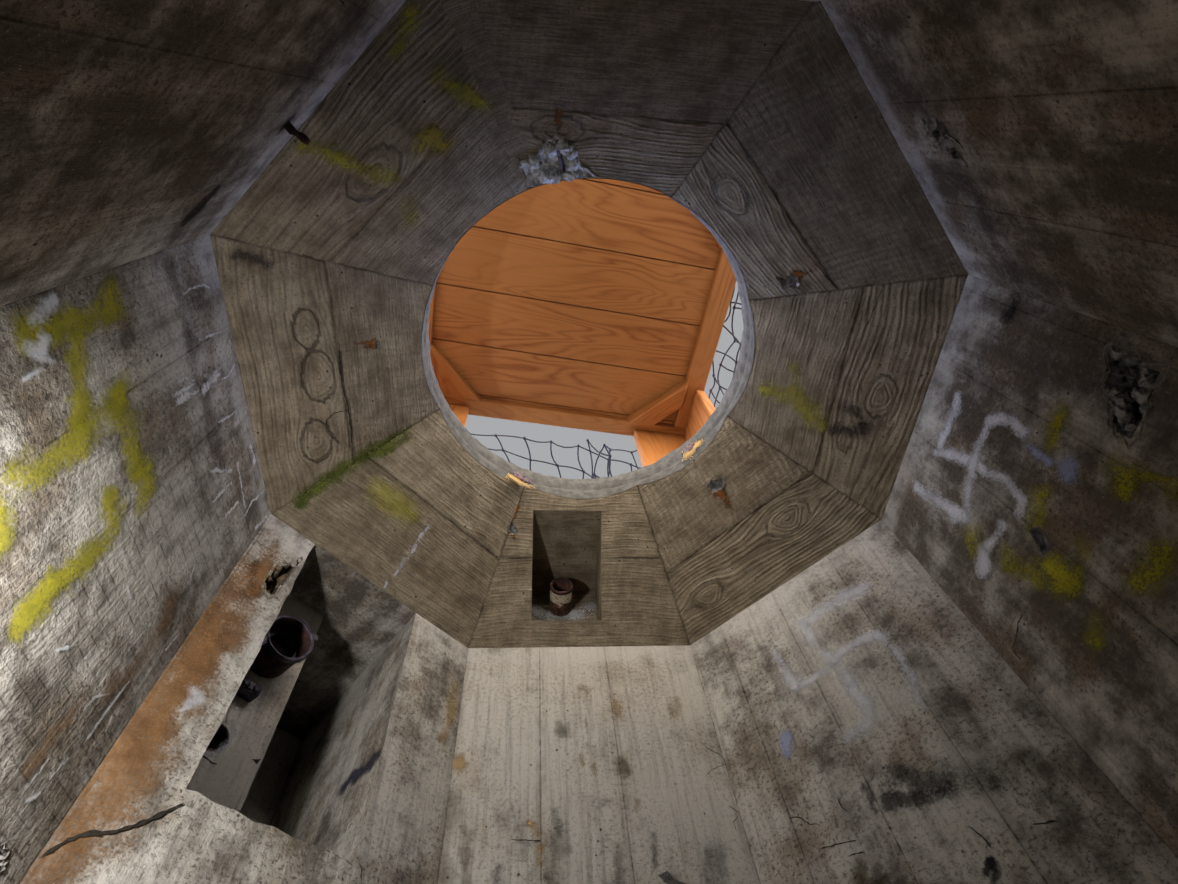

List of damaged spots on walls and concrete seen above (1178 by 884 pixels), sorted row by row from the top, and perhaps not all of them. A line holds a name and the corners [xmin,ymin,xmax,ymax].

spalling [519,108,601,187]
spalling [1101,334,1172,450]
corrosion [23,540,286,884]
spalling [0,842,11,873]
crack [40,803,184,858]